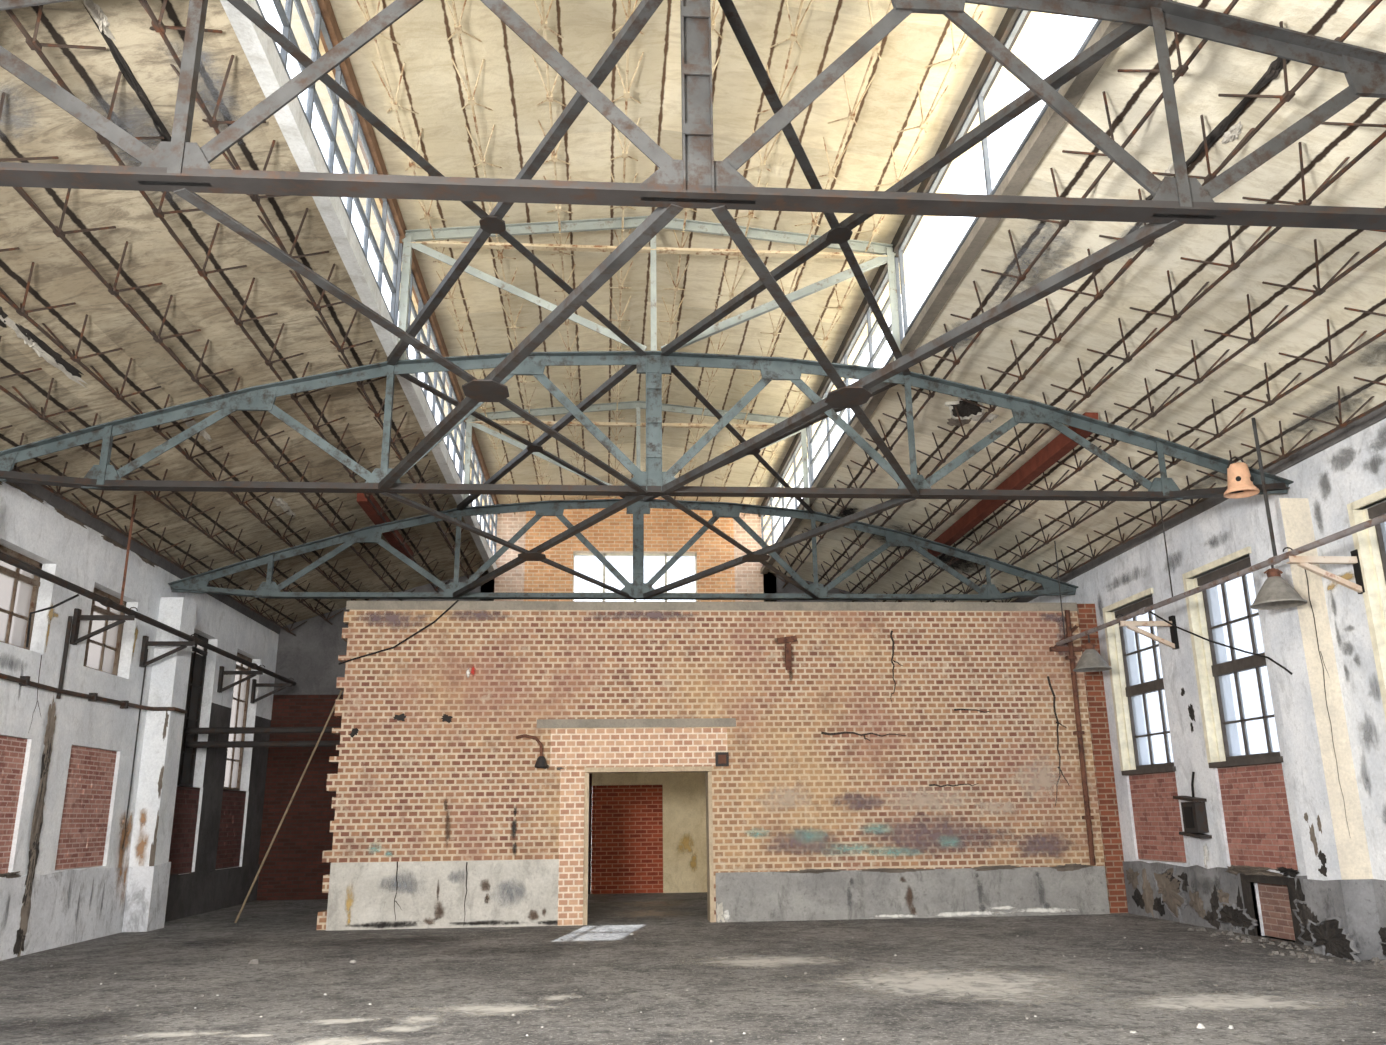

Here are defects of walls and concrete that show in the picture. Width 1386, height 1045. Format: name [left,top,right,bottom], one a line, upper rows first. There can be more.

crack [1047,676,1069,806]
damp [1364,721,1372,745]
rust [118,812,147,899]
spalling [1126,865,1361,962]